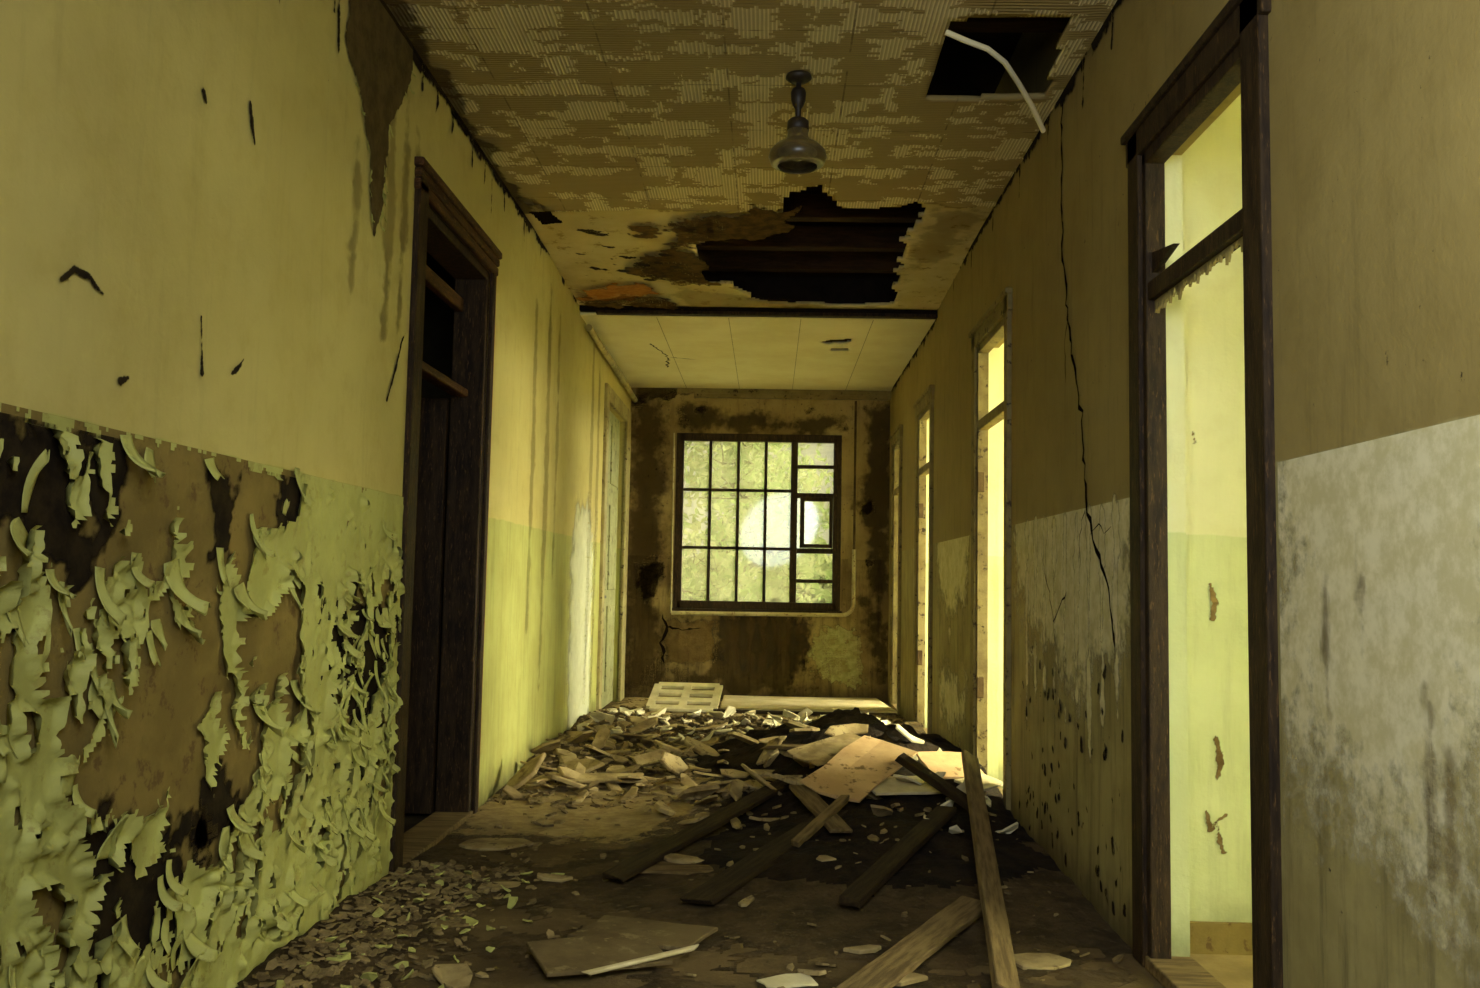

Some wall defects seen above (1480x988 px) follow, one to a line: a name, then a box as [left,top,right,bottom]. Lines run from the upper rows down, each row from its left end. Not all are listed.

peeling [0,403,405,988]
damp [380,0,550,255]
spalling [576,204,803,286]
damp [625,388,848,697]
damp [851,309,938,684]
damp [953,0,1122,291]
crack [1041,554,1066,644]
crack [1060,105,1116,659]